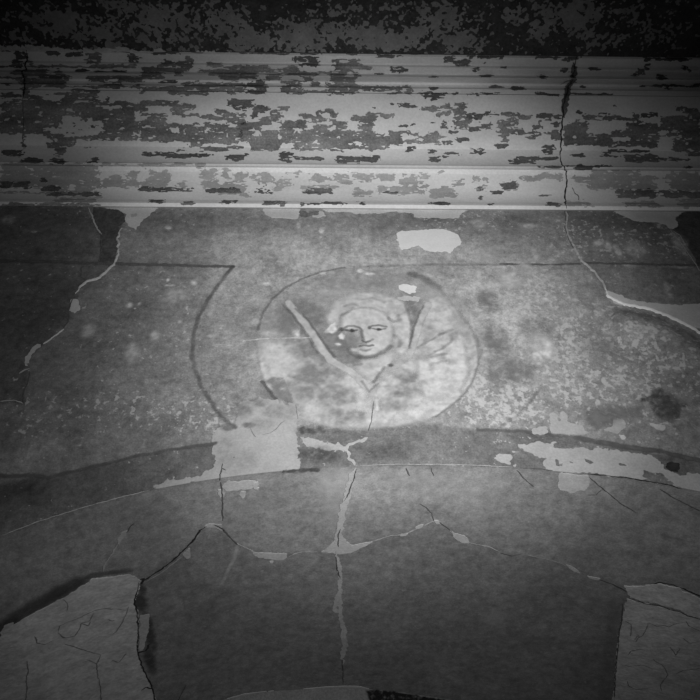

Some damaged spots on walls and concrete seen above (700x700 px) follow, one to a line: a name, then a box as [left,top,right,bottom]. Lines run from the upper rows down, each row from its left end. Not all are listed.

peeling [0,0,700,267]
crack [560,56,700,334]
spalling [0,574,156,700]
crack [34,463,252,700]
spalling [153,397,345,499]
crack [332,403,374,682]
crack [372,504,452,542]
spalling [478,454,516,467]
spalling [518,411,700,493]
crack [590,474,700,512]
crack [601,580,700,697]
spalling [611,583,700,700]